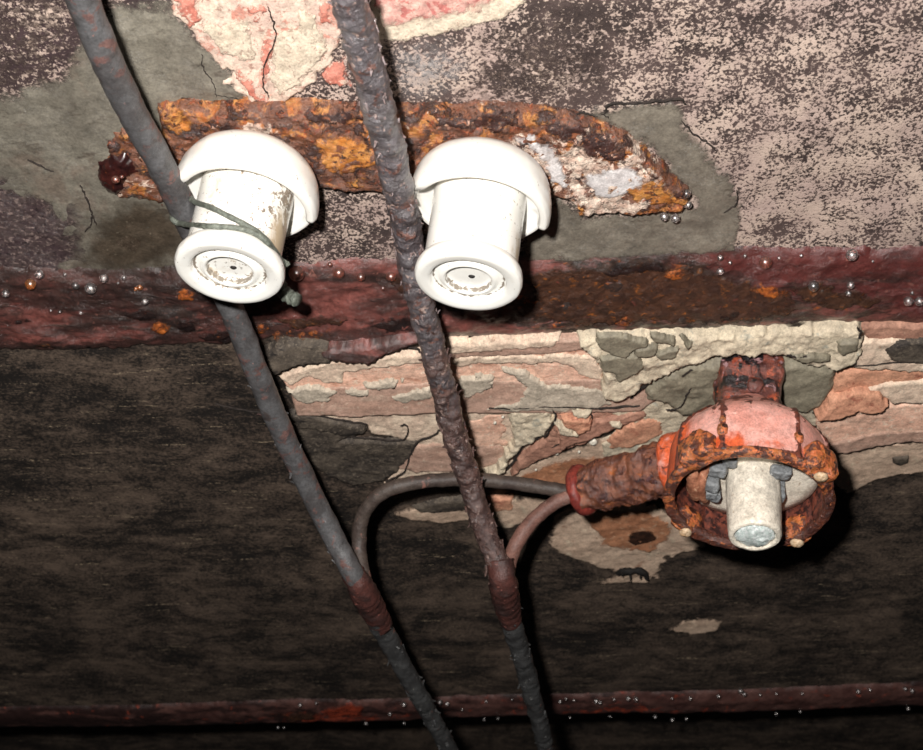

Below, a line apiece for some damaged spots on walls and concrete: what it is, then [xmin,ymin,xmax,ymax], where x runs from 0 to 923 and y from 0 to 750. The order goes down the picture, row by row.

peeling [171,0,351,103]
crack [262,6,277,98]
peeling [370,0,526,42]
rust [98,128,164,206]
rust [161,110,219,136]
rust [315,136,376,188]
rust [541,119,626,164]
rust [530,261,880,328]
spalling [278,332,453,483]
spalling [445,320,923,493]
spalling [487,493,545,528]
spalling [549,502,705,584]